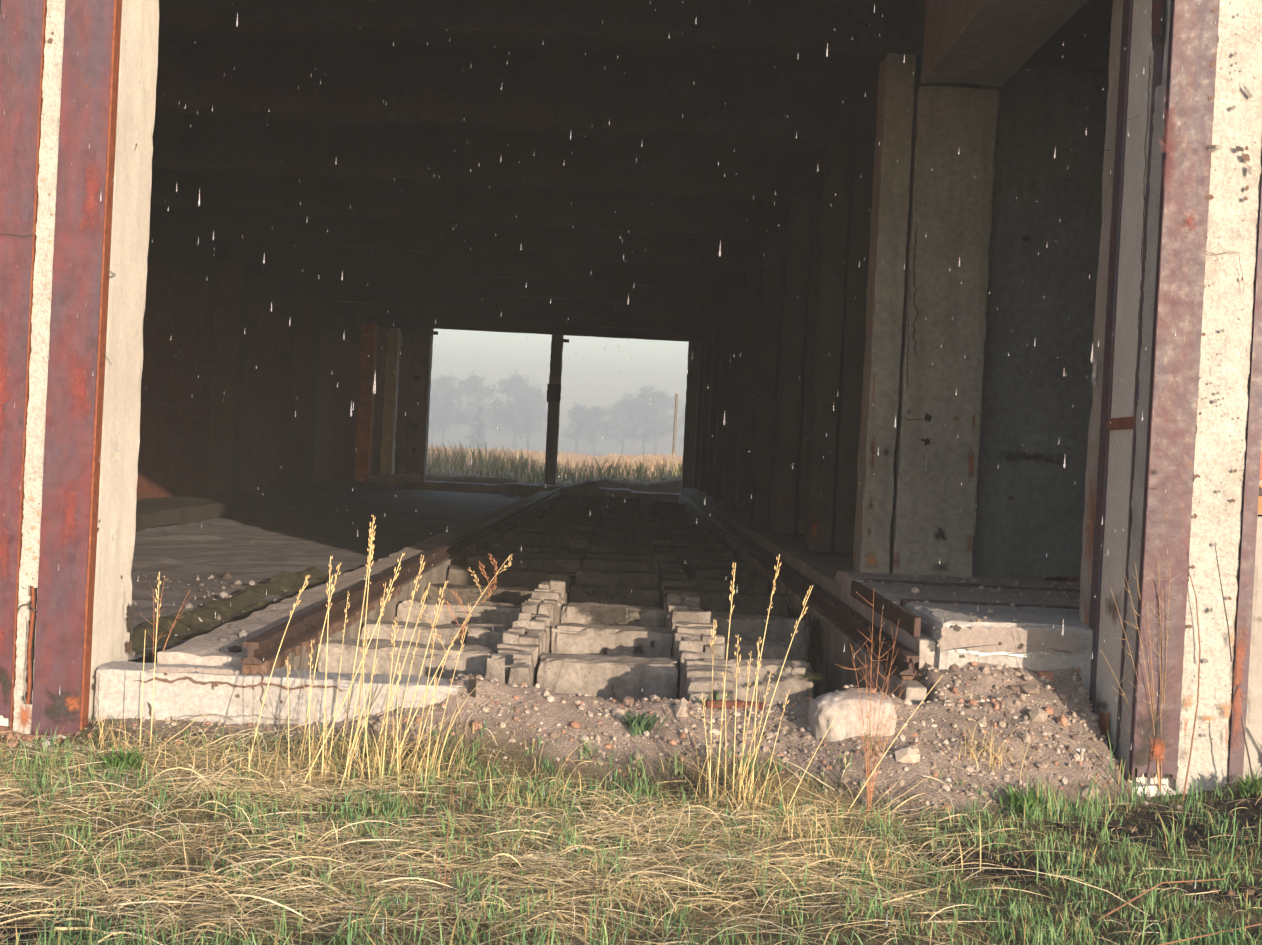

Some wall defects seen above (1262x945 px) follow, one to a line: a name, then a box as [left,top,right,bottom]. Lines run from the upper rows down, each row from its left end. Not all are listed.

crack [902,230,922,420]